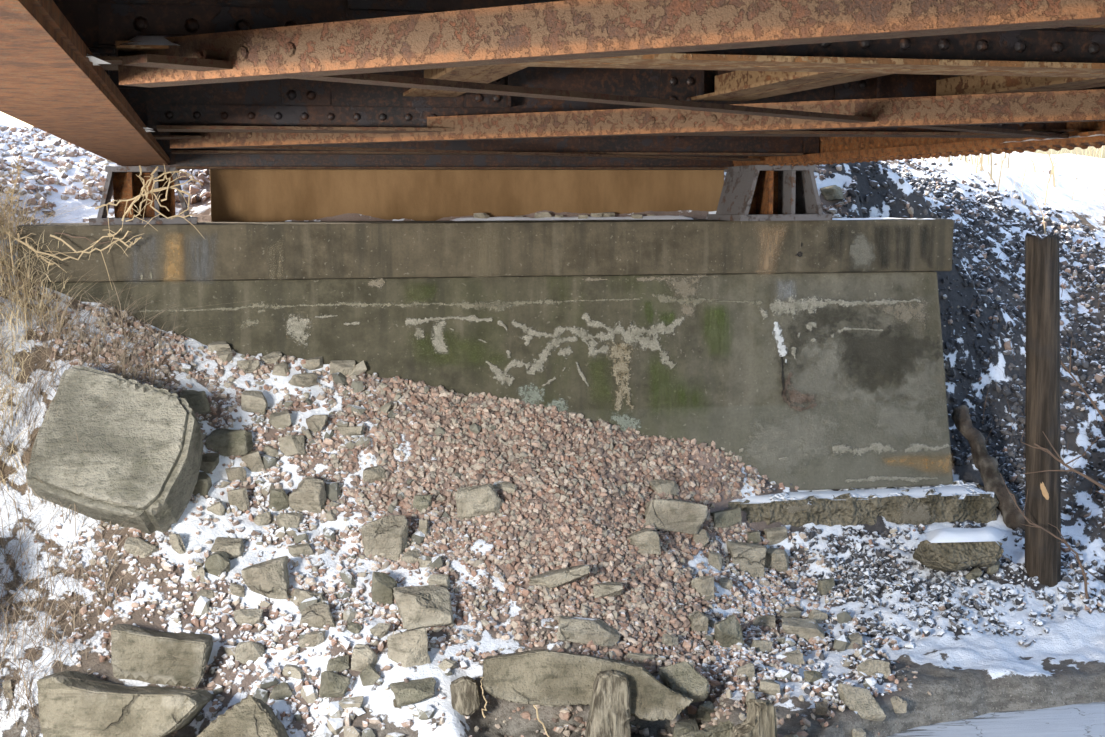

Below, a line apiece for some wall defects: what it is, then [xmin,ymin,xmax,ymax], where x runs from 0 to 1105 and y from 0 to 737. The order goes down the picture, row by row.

damp [126,298,640,313]
damp [652,276,940,390]
damp [606,342,638,411]